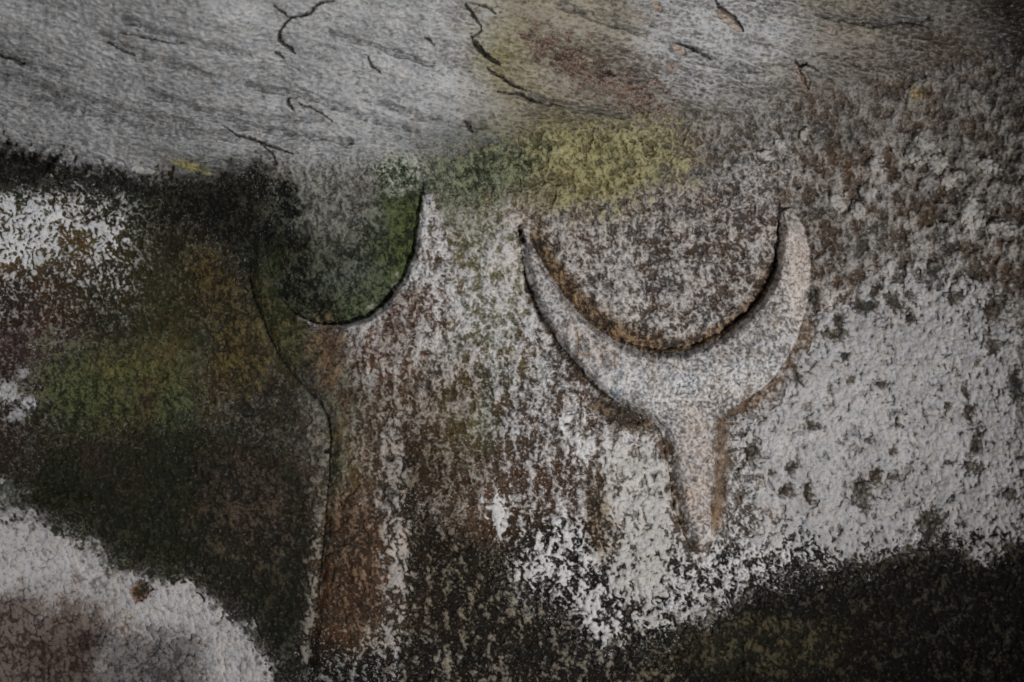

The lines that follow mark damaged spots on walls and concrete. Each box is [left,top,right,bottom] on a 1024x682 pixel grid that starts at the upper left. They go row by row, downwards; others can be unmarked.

crack [273,0,334,59]
crack [464,3,543,104]
damp [0,130,275,315]
damp [0,368,36,421]
damp [0,508,282,682]
damp [298,398,334,664]
damp [374,258,1024,682]